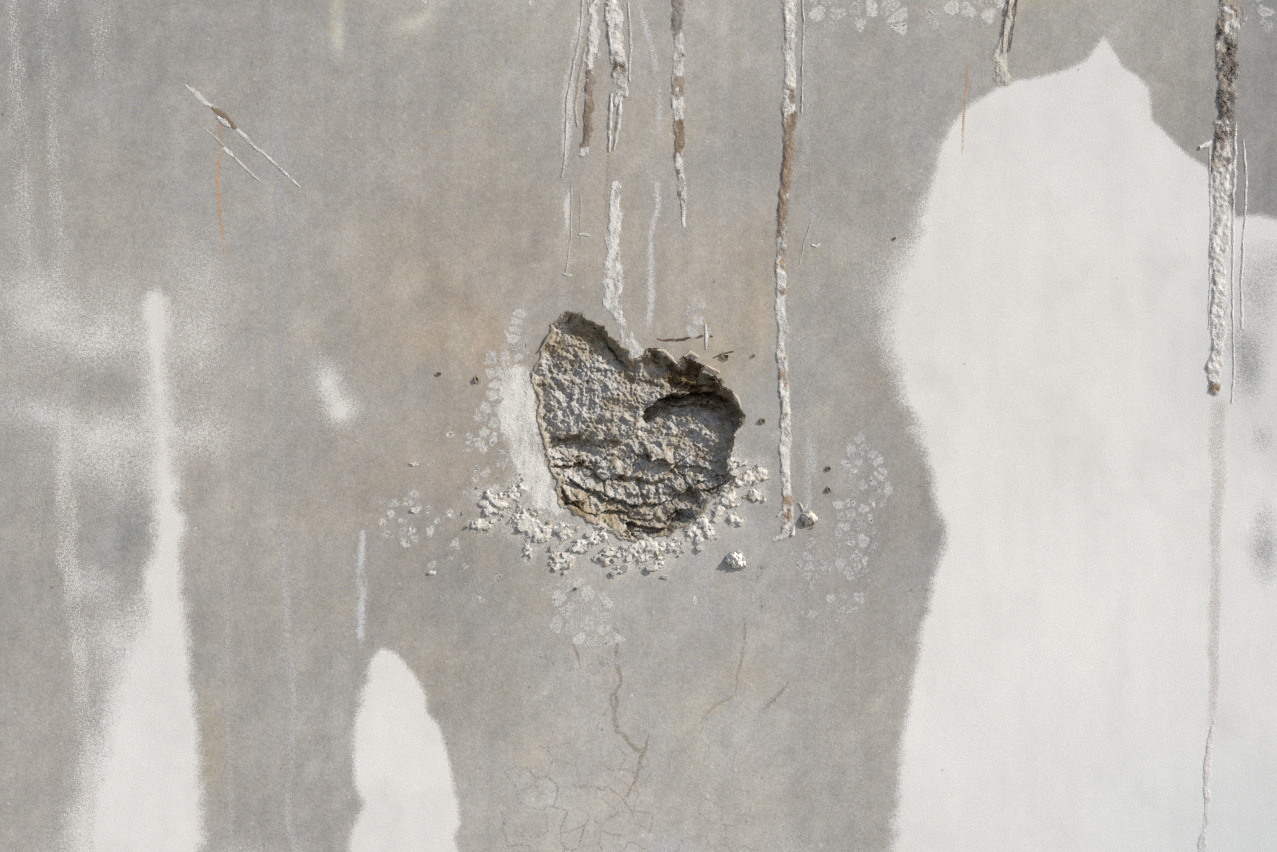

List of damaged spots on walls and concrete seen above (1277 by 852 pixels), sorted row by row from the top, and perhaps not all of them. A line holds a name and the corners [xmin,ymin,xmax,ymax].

spalling [378,300,765,576]